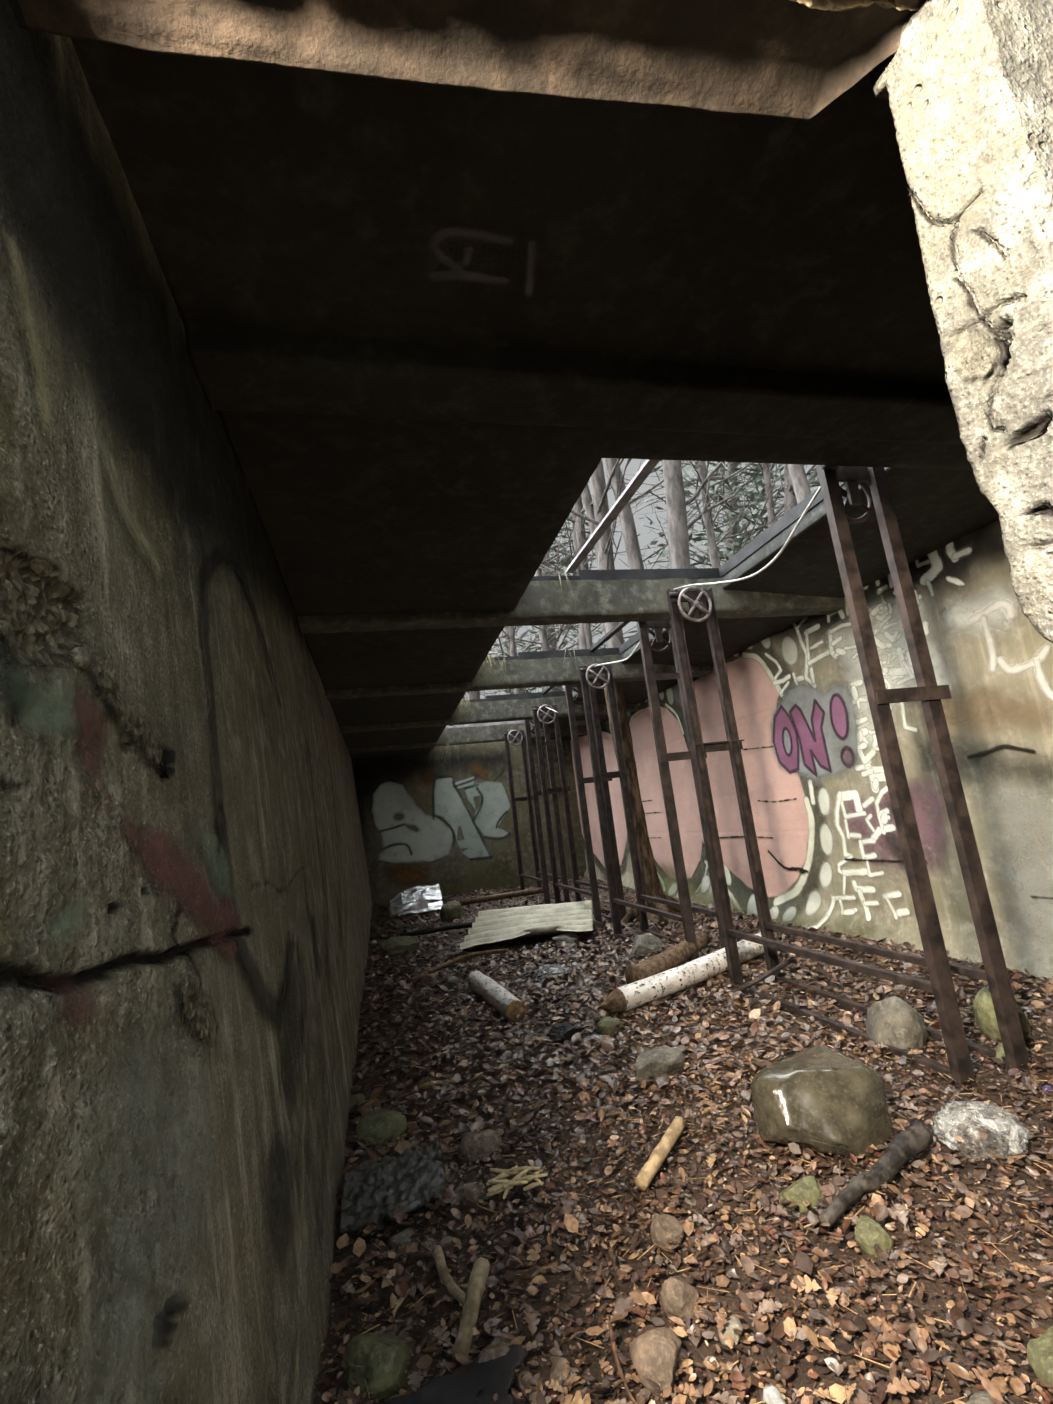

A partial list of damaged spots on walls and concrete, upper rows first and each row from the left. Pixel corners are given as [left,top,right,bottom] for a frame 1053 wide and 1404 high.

spalling [790,0,921,12]
crack [908,187,1025,459]
spalling [0,547,175,778]
crack [0,903,253,990]